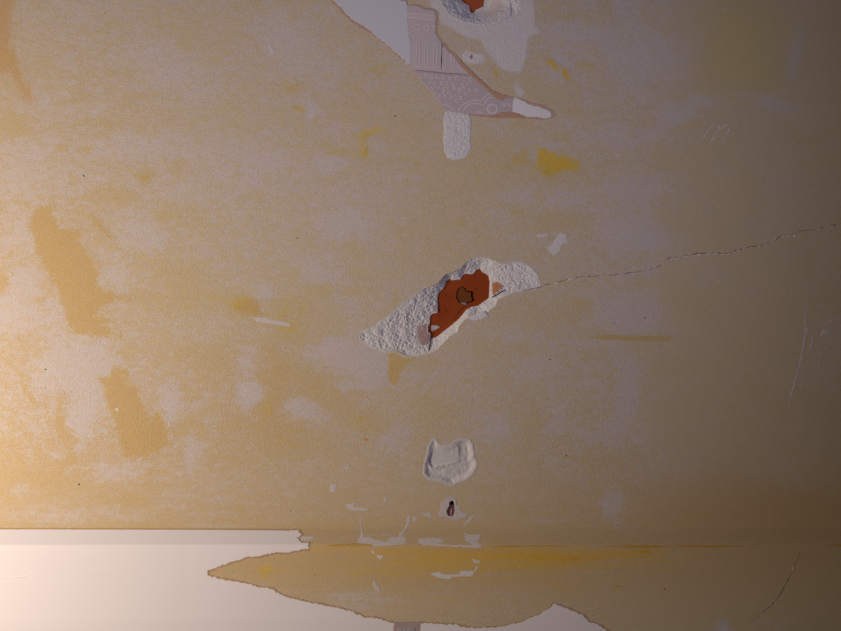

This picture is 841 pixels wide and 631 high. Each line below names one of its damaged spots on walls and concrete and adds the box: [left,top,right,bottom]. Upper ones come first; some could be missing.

peeling [330,0,556,120]
damp [528,140,584,178]
damp [24,201,135,342]
flaking render [359,256,542,358]
crack [523,224,836,291]
damp [15,365,87,471]
damp [95,360,175,462]
flaking render [423,438,477,486]
peeling [346,496,468,559]
peeling [0,528,610,631]